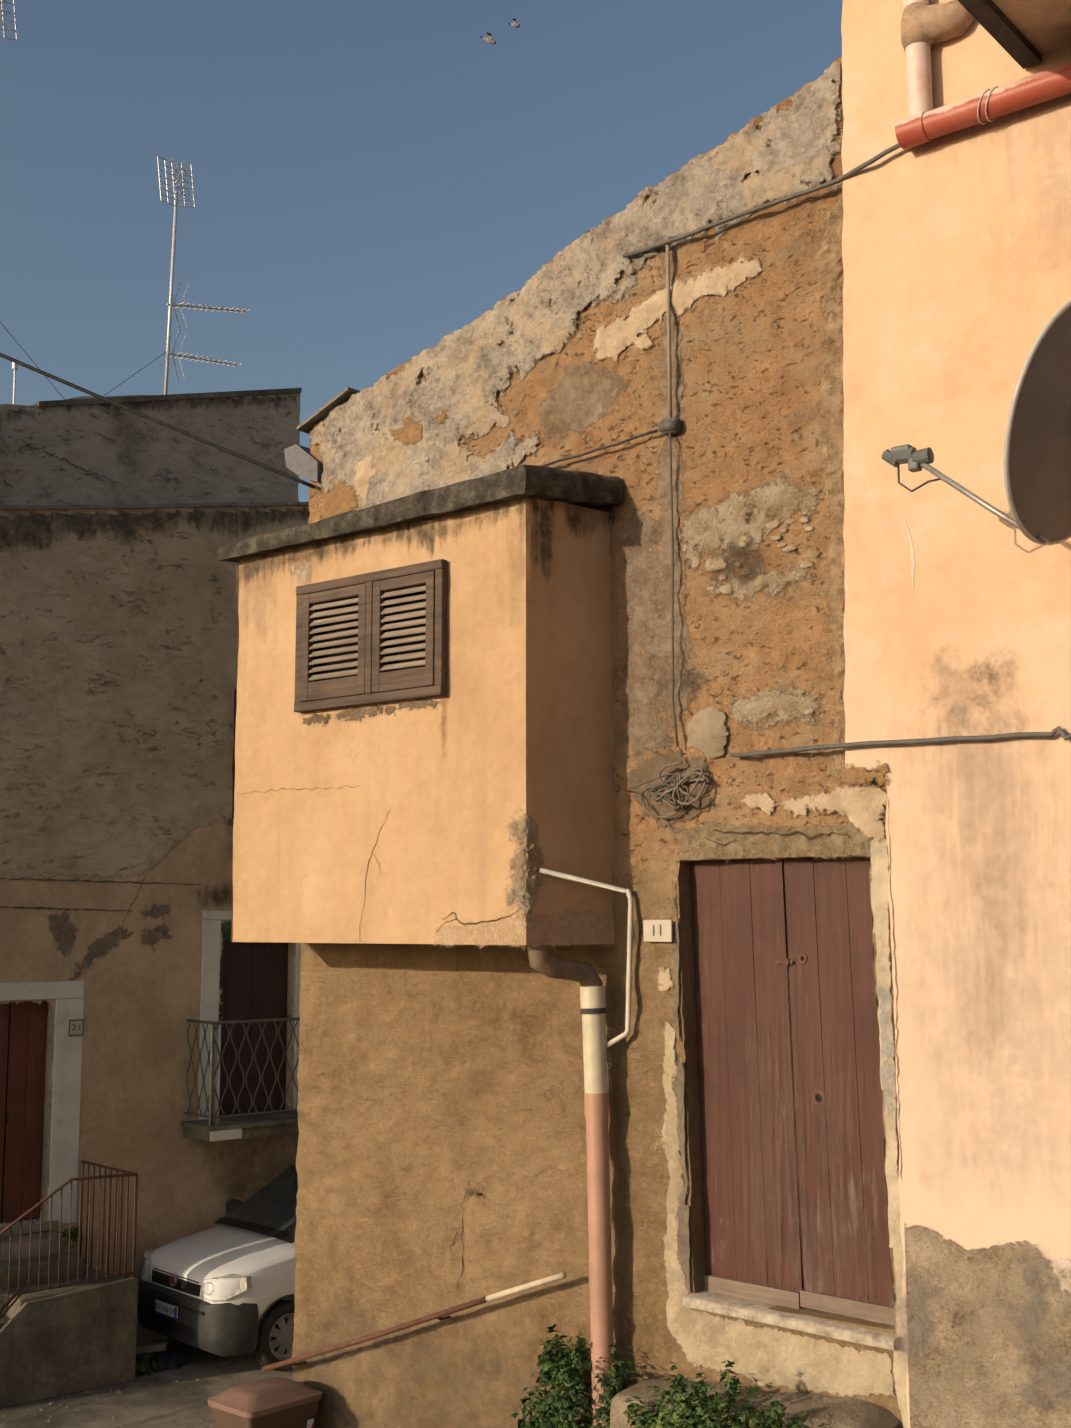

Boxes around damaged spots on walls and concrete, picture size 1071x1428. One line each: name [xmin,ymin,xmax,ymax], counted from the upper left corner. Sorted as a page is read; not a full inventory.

flaking render [310,62,843,520]
leakage [0,507,310,549]
leakage [242,521,446,586]
spalling [679,476,825,603]
crack [243,785,359,794]
flaking render [741,760,890,842]
crack [359,811,390,933]
crack [436,908,521,933]
spalling [505,809,546,923]
flaking render [657,966,673,993]
crack [449,1182,469,1288]
flaking render [661,1022,1071,1428]